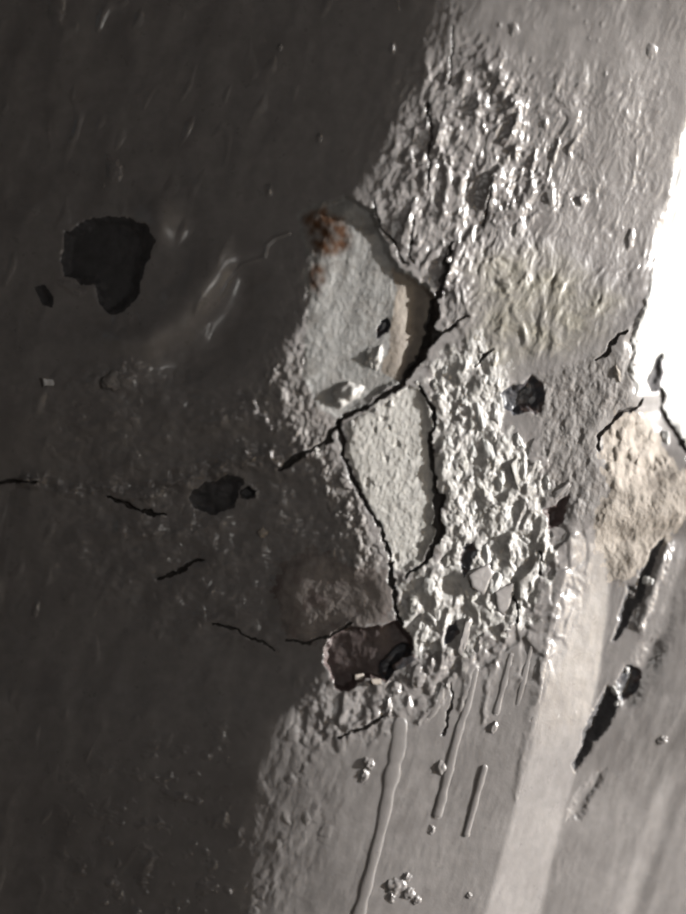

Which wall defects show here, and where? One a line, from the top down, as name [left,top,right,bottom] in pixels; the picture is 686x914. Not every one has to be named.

corrosion [297,201,359,300]
crack [373,201,415,265]
crack [594,330,629,361]
crack [278,242,470,626]
spalling [256,127,686,752]
crack [596,388,686,453]
crack [0,477,38,485]
crack [212,622,353,651]
spalling [571,665,642,771]